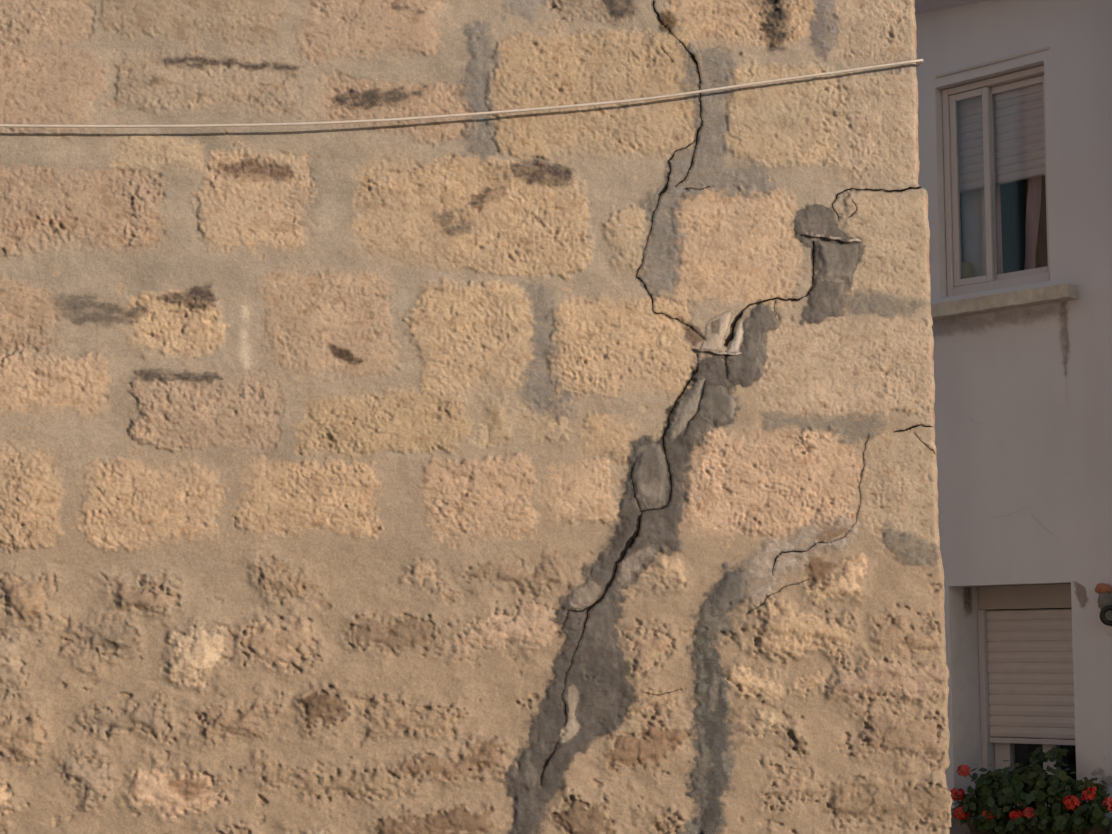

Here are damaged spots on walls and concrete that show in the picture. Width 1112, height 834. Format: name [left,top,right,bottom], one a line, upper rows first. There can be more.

crack [832,186,922,221]
crack [540,0,815,786]
crack [748,424,935,614]